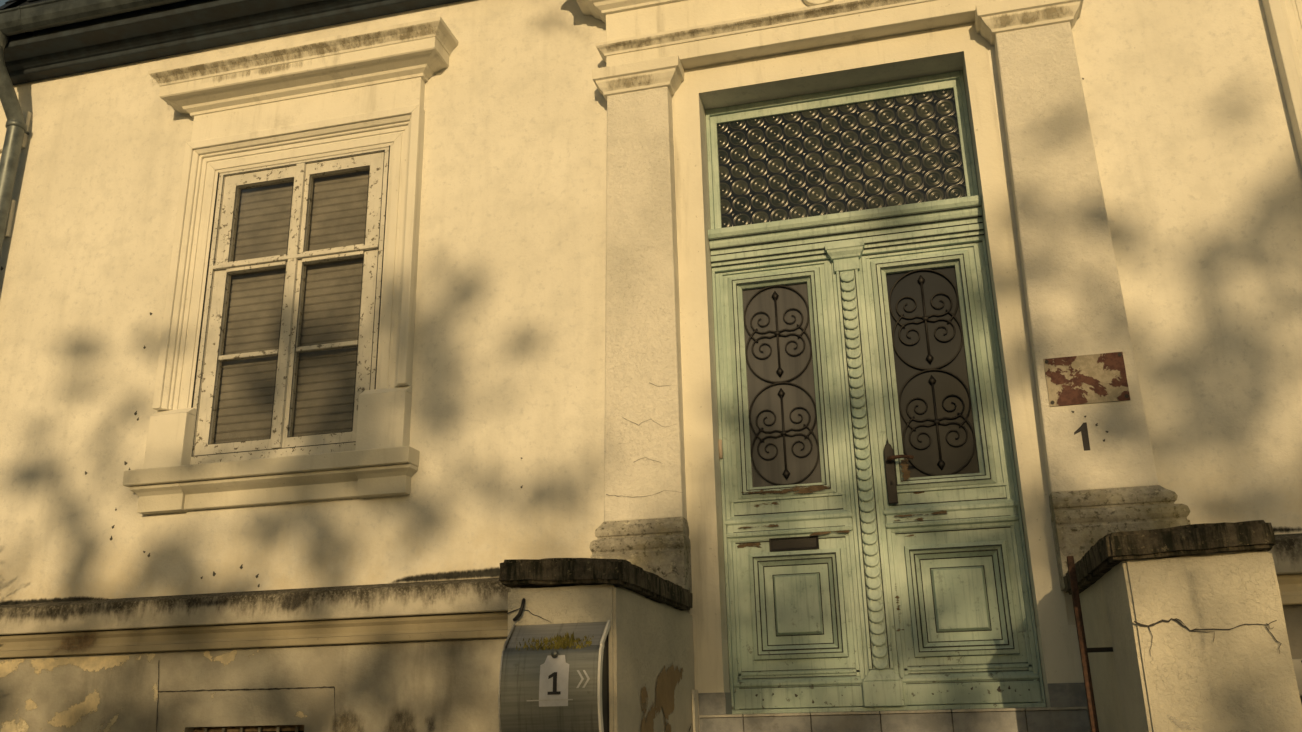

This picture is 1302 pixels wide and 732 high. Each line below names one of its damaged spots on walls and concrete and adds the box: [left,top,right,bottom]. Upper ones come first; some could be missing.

damp [0,597,109,619]
damp [282,593,308,609]
crack [1134,618,1282,656]
peeling [0,653,155,678]
peeling [0,690,119,732]
peeling [641,665,683,732]